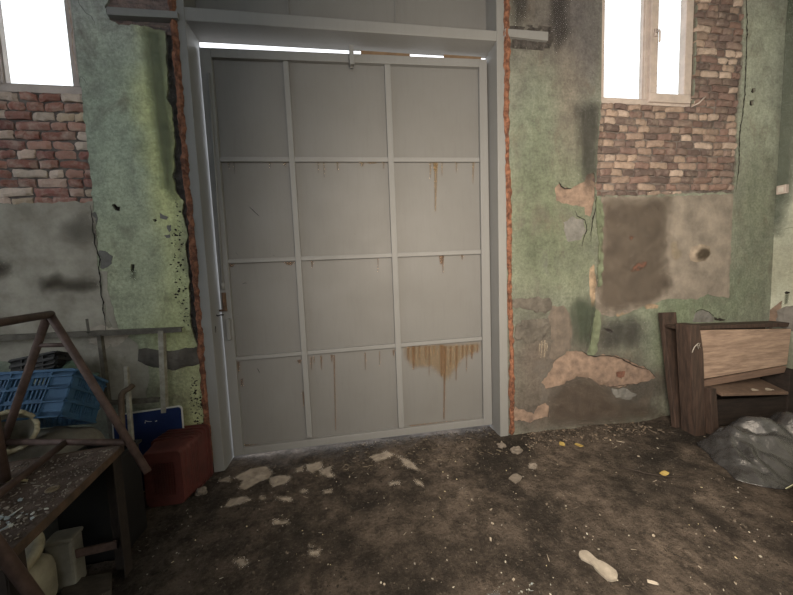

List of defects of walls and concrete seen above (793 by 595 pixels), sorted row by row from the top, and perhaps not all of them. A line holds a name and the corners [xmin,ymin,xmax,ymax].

flaking render [0,91,93,204]
flaking render [541,0,744,400]
leakage [43,278,93,289]
crack [90,206,106,330]
flaking render [514,403,549,423]